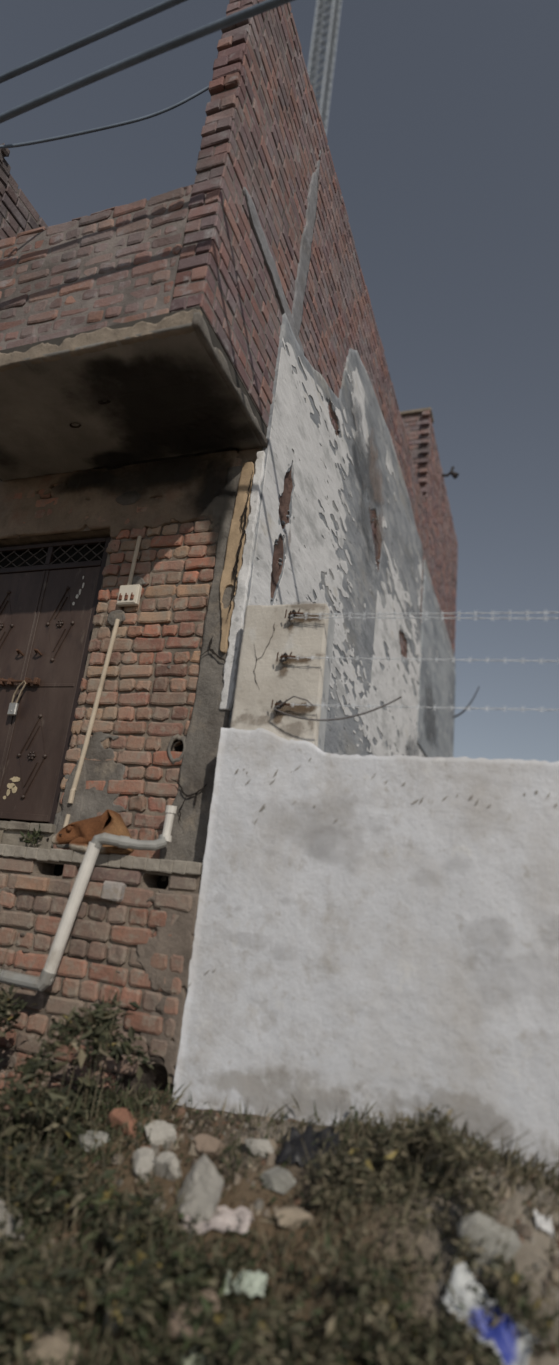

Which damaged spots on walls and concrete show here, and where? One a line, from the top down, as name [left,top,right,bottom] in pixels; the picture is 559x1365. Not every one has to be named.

water stain [57,453,132,491]
peeling [220,338,425,758]